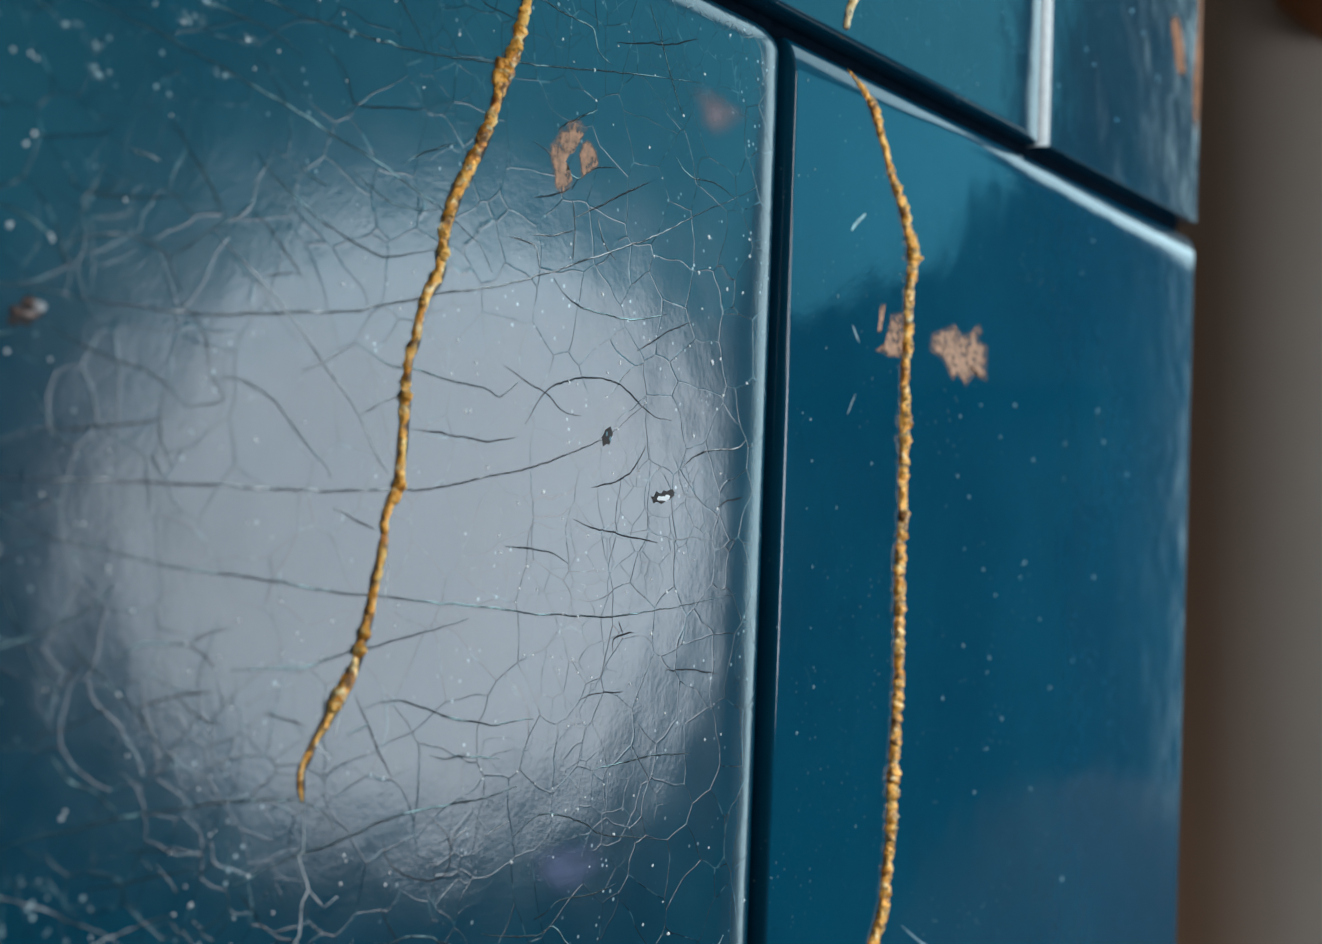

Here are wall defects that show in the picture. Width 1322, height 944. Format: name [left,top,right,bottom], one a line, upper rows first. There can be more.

crack [844,0,858,30]
peeling [551,123,598,191]
peeling [933,327,985,382]
crack [0,0,757,944]
crack [848,69,925,944]